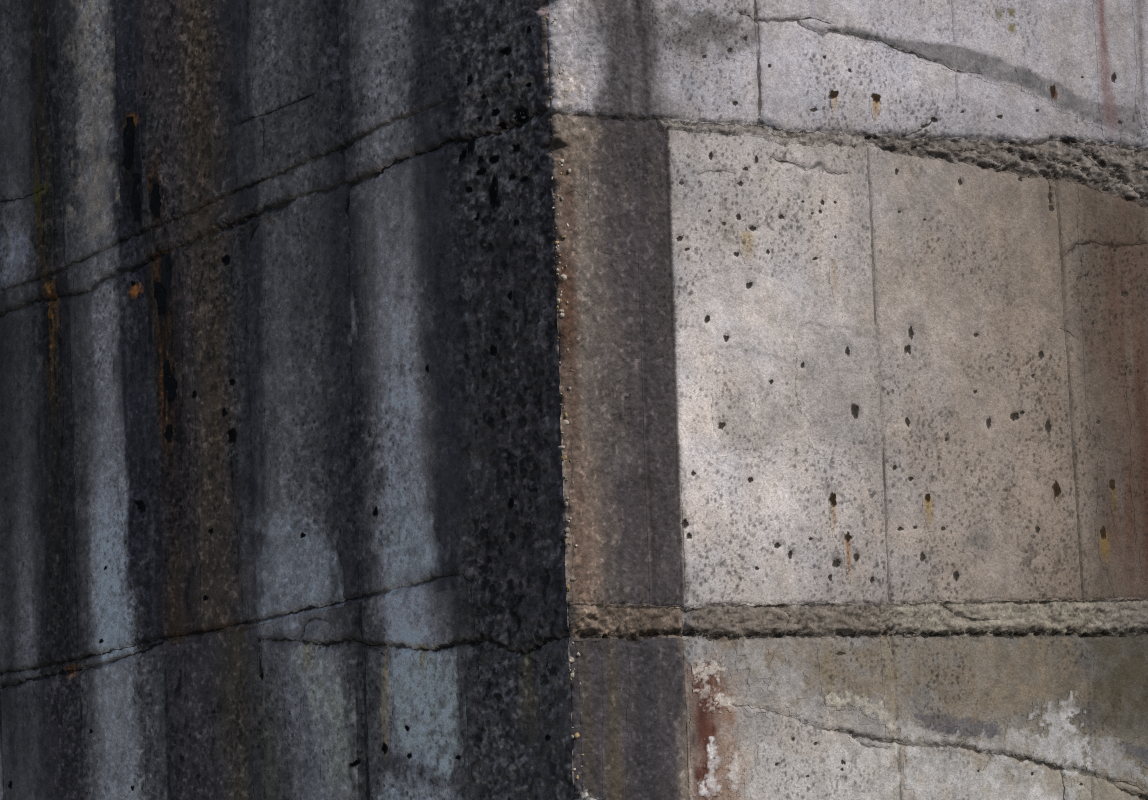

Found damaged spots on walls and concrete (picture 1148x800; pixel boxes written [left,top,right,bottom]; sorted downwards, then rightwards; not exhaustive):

corrosion [1093,0,1123,141]
crack [0,93,1148,317]
spalling [657,107,1148,211]
leakage [87,267,168,661]
corrosion [119,100,196,645]
leakage [133,0,382,800]
spalling [558,386,572,463]
leakage [364,0,1148,800]
crack [0,573,1148,689]
spalling [565,562,1148,685]
corrosion [684,639,753,800]
crack [731,703,1148,800]